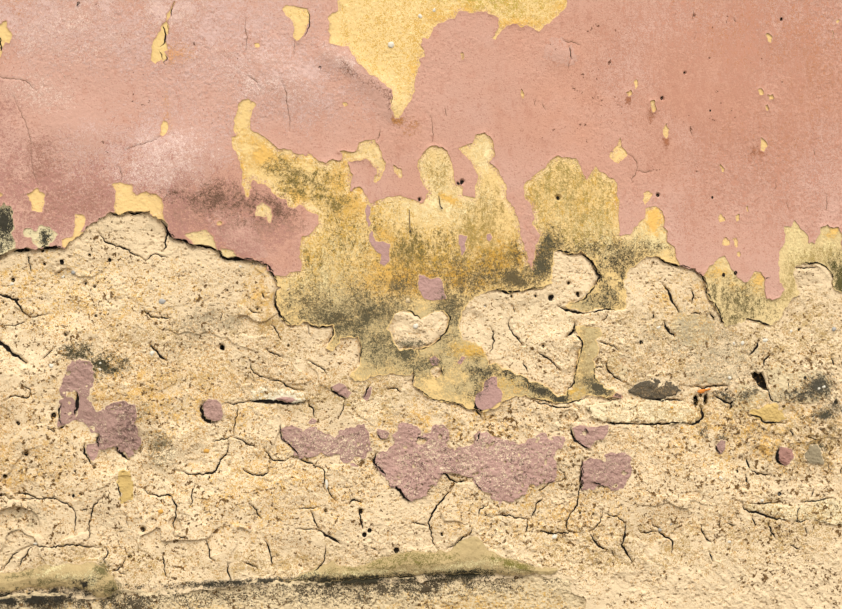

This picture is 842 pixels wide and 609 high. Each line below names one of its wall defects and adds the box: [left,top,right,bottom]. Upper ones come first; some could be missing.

peeling [0,21,13,57]
peeling [151,1,175,64]
peeling [282,5,309,41]
peeling [328,0,567,118]
crack [0,245,61,256]
crack [161,221,334,343]
peeling [231,99,555,367]
crack [557,250,602,303]
crack [655,256,724,323]
flaking render [0,156,842,609]
crack [408,311,470,410]
crack [528,335,618,404]